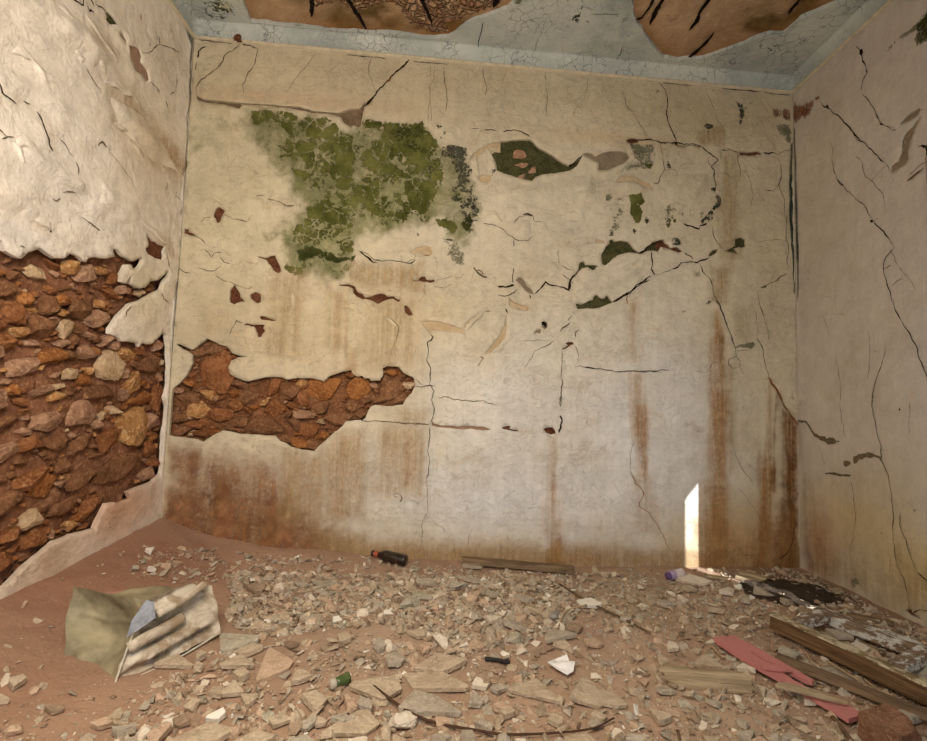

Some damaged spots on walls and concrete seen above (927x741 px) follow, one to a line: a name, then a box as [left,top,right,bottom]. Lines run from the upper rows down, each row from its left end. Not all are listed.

spalling [244,0,511,38]
crack [688,0,714,57]
spalling [633,0,834,57]
crack [0,84,79,202]
mould [426,125,481,226]
flaking render [469,141,629,183]
flaking render [141,218,166,260]
flaking render [259,256,281,273]
mould [444,239,464,265]
crack [360,251,574,313]
crack [527,315,669,433]
crack [574,79,927,613]